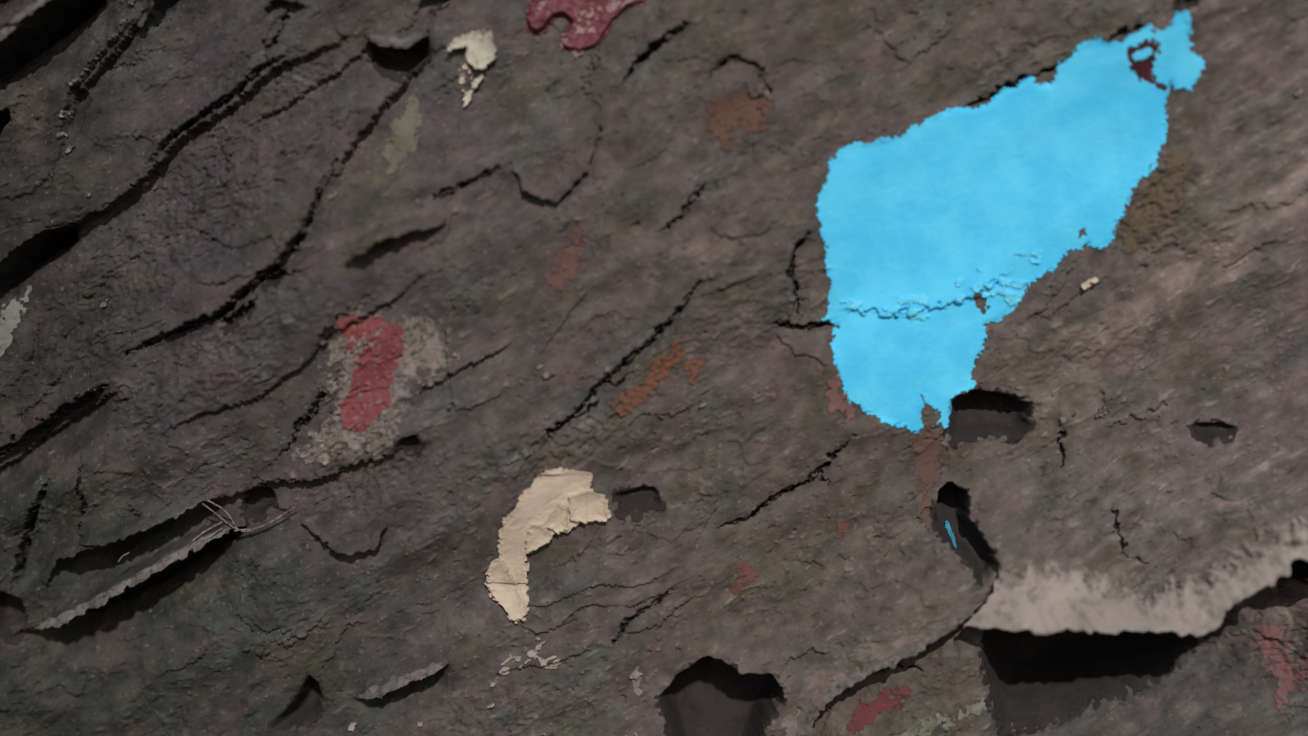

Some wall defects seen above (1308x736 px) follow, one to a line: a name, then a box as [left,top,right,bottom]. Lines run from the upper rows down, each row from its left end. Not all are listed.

crack [152,11,290,157]
spalling [364,0,497,107]
crack [126,159,338,355]
crack [315,313,349,348]
peeling [1080,277,1098,290]
crack [0,384,109,456]
crack [279,389,327,457]
spalling [942,385,1036,450]
crack [722,434,857,527]
peeling [0,484,279,645]
peeling [484,467,667,624]
spalling [654,481,1308,736]